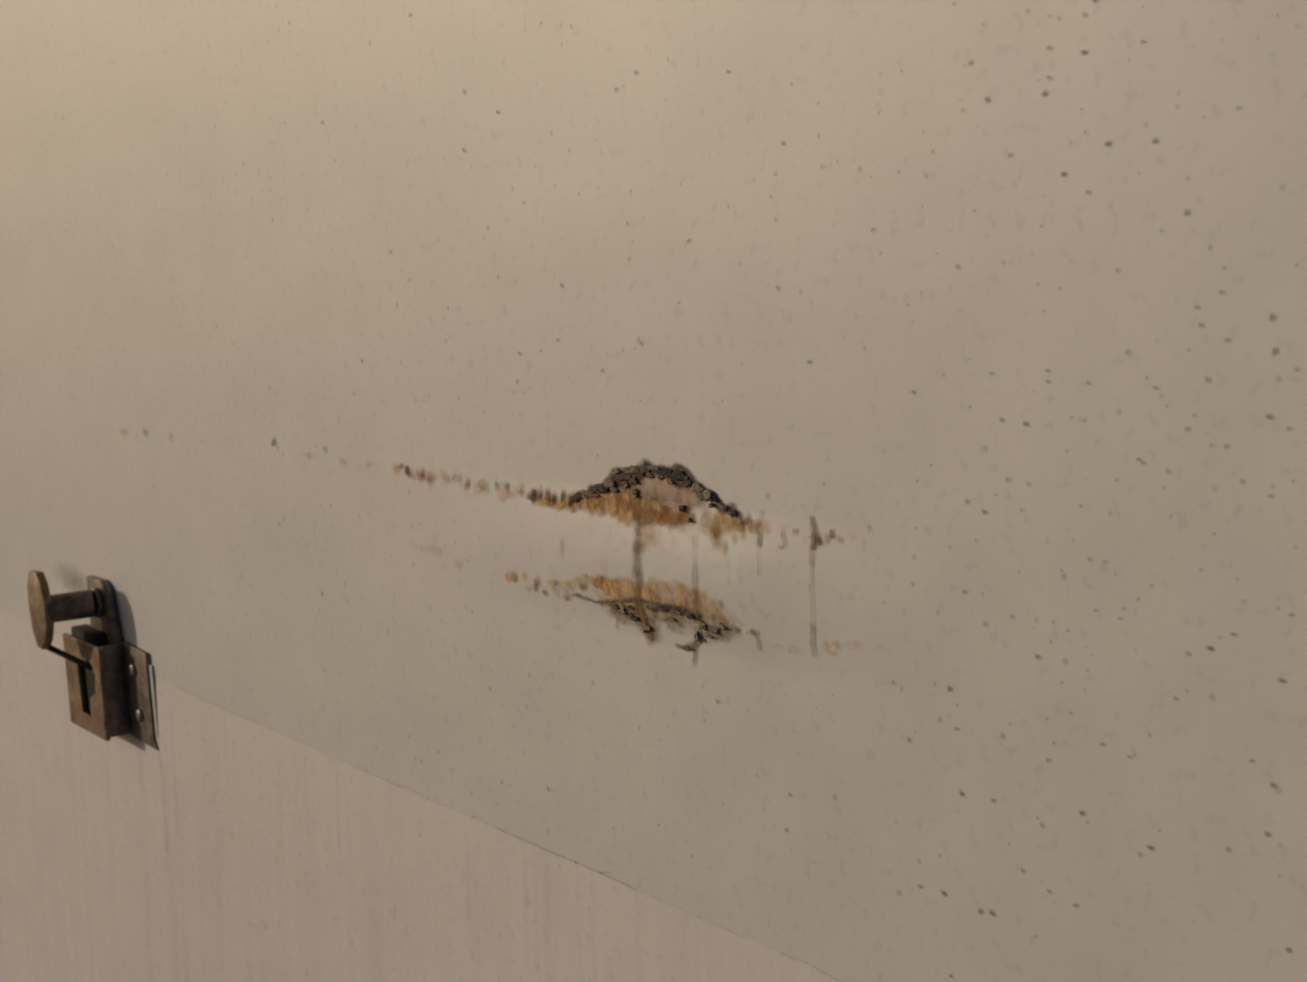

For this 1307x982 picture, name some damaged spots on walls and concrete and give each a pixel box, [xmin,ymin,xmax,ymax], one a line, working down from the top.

rust [495,484,760,644]
peeling [569,460,737,523]